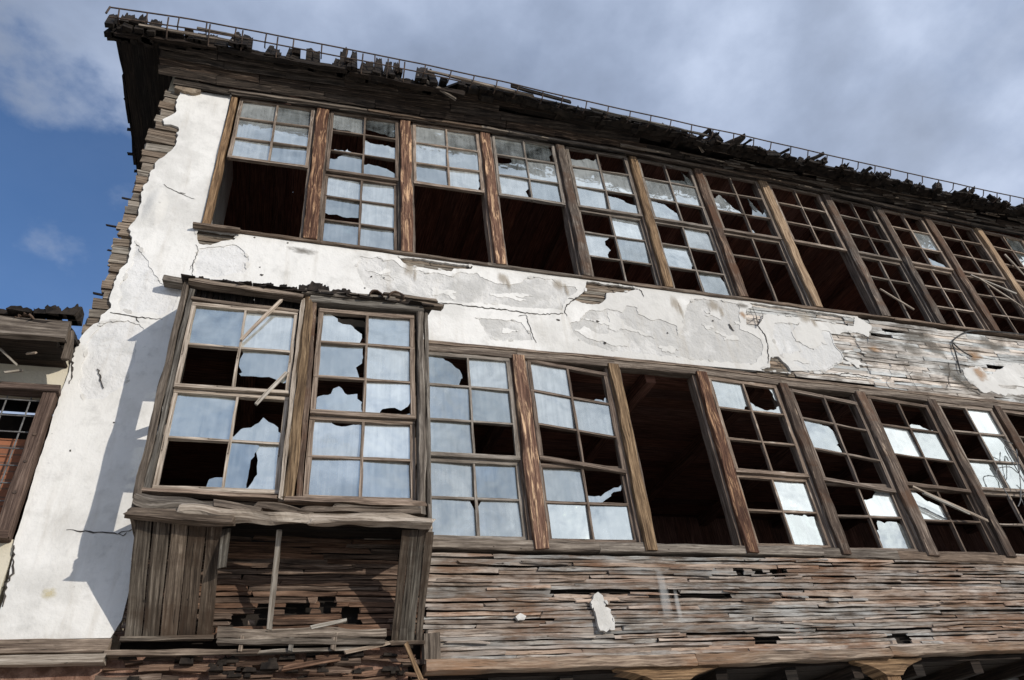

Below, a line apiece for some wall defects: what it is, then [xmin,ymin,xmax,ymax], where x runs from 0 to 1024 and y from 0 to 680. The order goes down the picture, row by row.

flaking render [79,240,179,400]
crack [441,294,582,341]
flaking render [355,255,867,381]
crack [67,528,132,536]